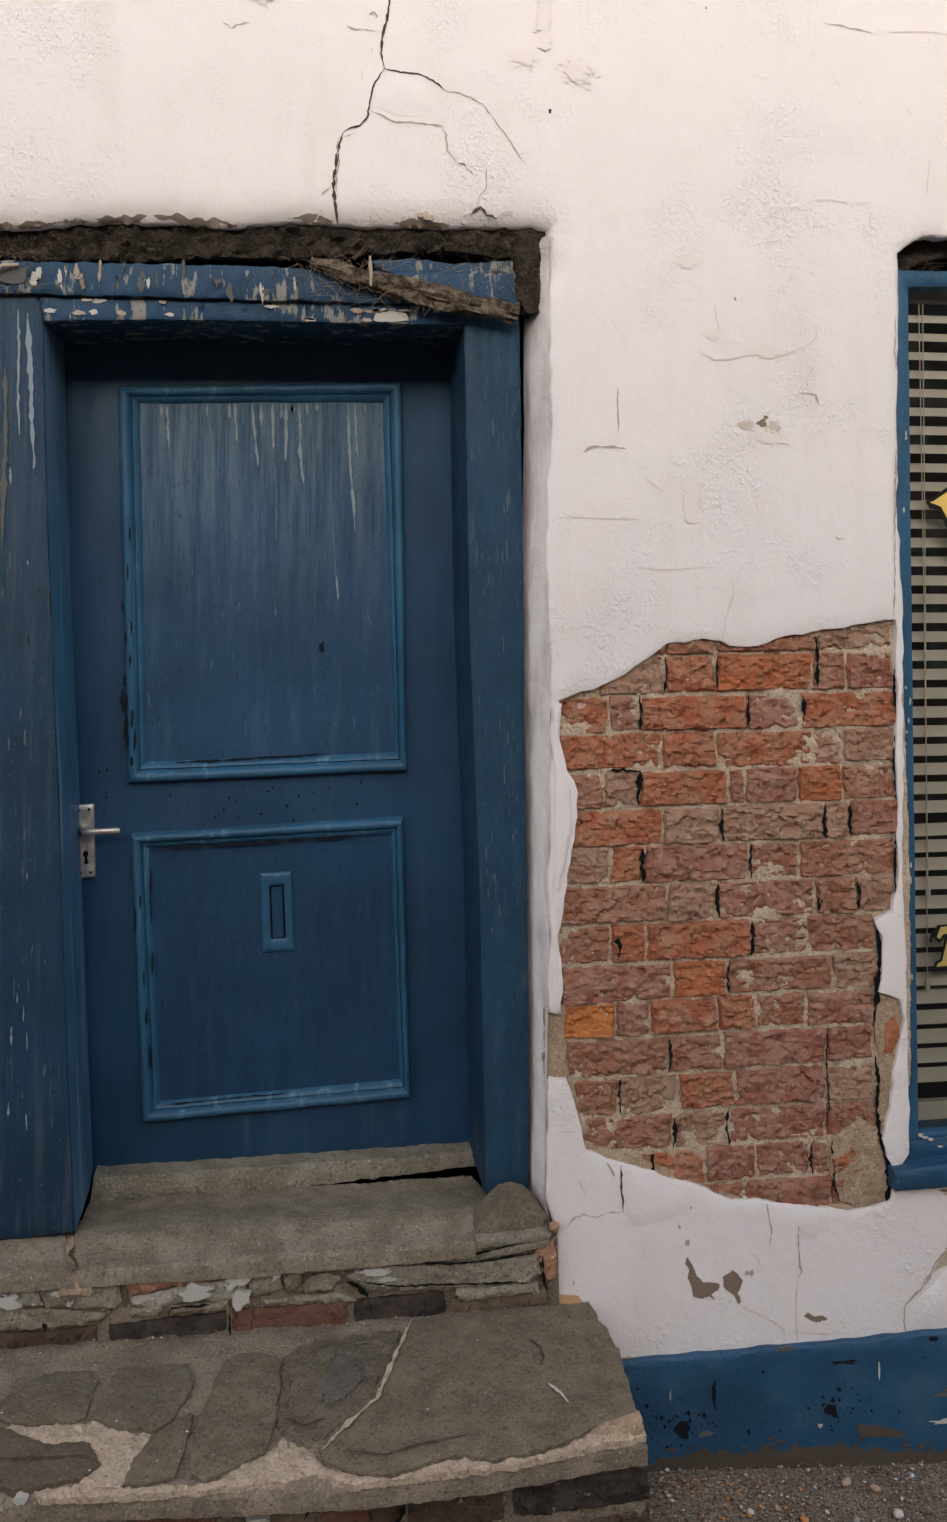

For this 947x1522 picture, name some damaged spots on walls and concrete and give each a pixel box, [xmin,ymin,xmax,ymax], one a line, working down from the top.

crack [314,0,525,224]
spalling [0,212,545,319]
peeling [351,308,412,322]
spalling [542,620,913,1210]
peeling [685,1257,743,1304]
crack [738,1206,802,1341]
crack [903,1248,947,1332]
peeling [636,1381,729,1448]
peeling [803,1360,873,1431]